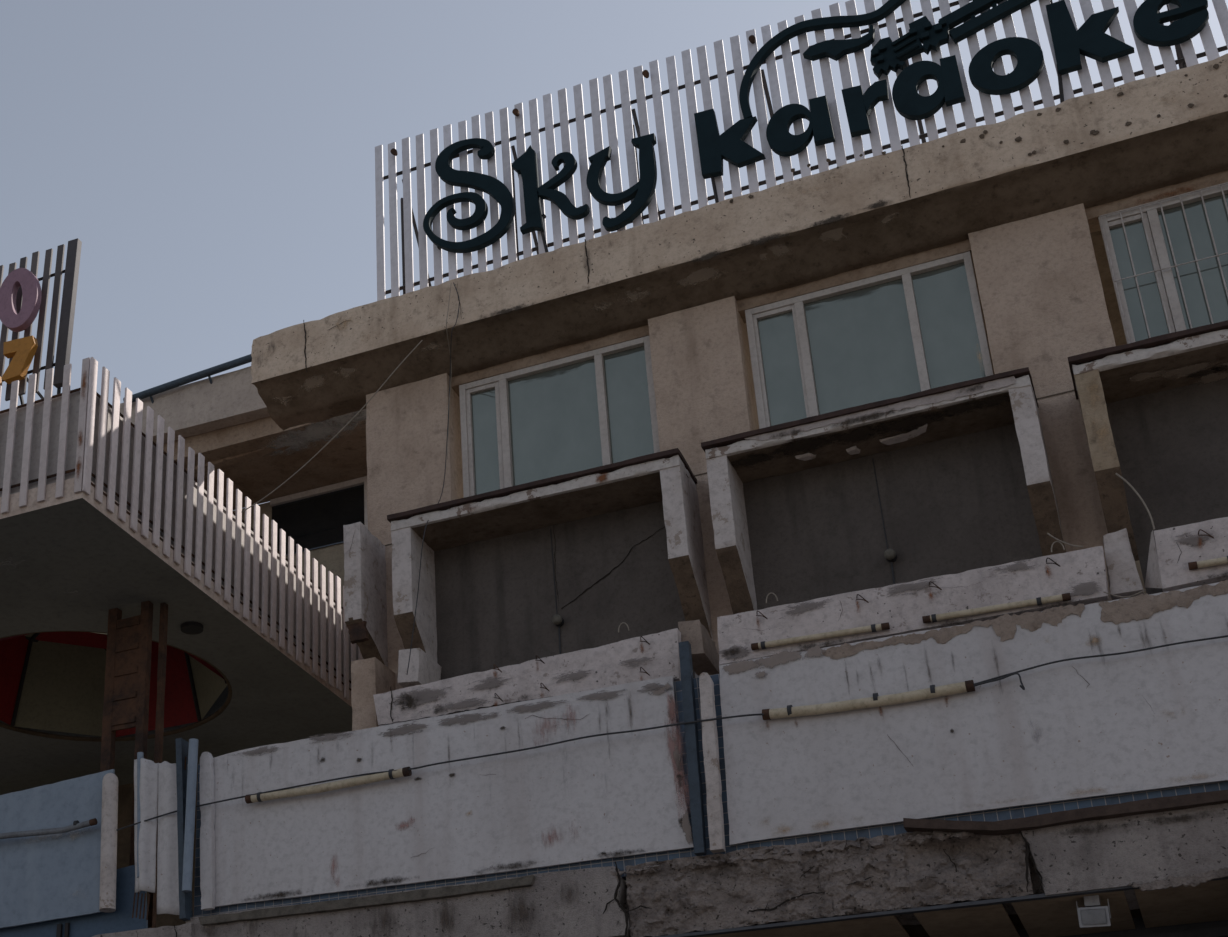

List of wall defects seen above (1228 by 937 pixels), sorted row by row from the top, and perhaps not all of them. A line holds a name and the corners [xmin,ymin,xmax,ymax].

spalling [731,376,1016,467]
crack [553,525,663,609]
peeling [719,578,1228,678]
crack [603,861,650,937]
spalling [625,811,1033,937]
crack [1019,830,1045,893]